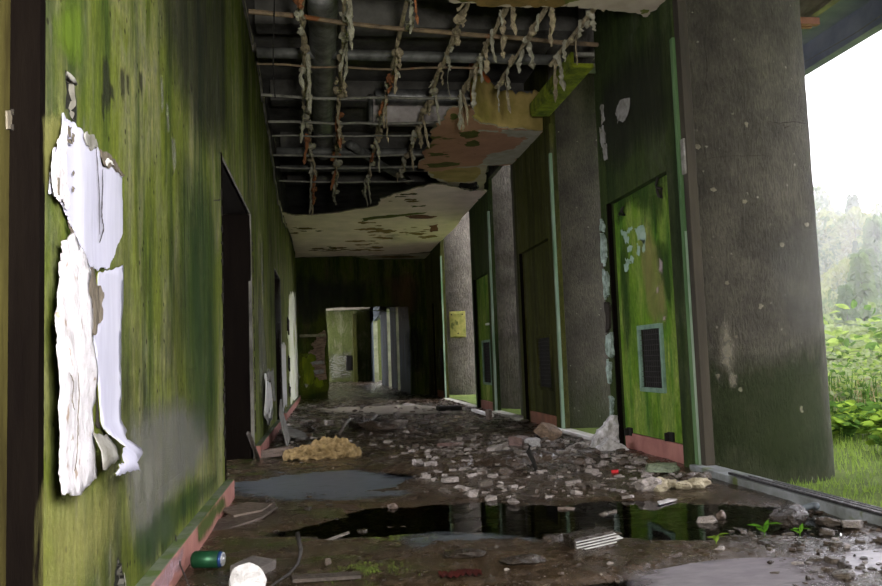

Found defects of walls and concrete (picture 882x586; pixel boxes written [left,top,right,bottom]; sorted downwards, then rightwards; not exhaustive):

peeling [458,0,579,8]
leakage [102,61,142,118]
leakage [165,0,227,140]
peeling [459,130,541,166]
peeling [599,104,608,161]
peeling [615,98,630,123]
peeling [308,193,438,251]
peeling [621,225,646,272]
peeling [48,70,143,496]
peeling [252,242,327,433]
leakage [131,409,204,562]